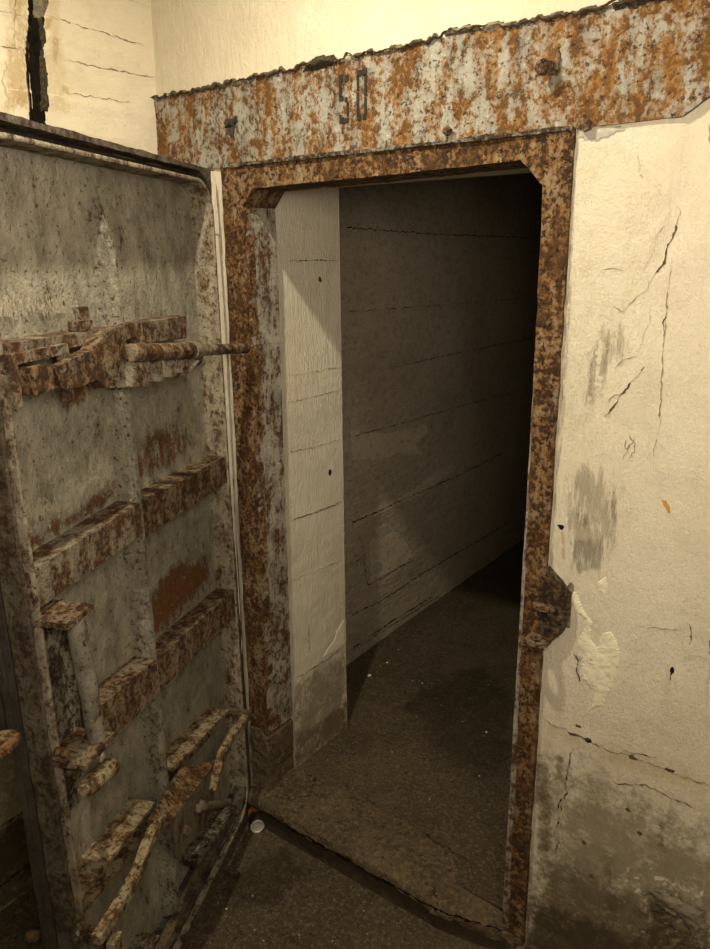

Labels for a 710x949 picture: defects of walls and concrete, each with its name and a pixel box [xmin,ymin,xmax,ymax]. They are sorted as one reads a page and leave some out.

crack [2,0,143,124]
crack [604,212,681,463]
rust [30,480,114,549]
rust [137,424,195,479]
rust [152,556,213,633]
peeling [567,582,620,709]
crack [543,718,709,858]
crack [263,811,523,948]
damp [525,767,710,949]